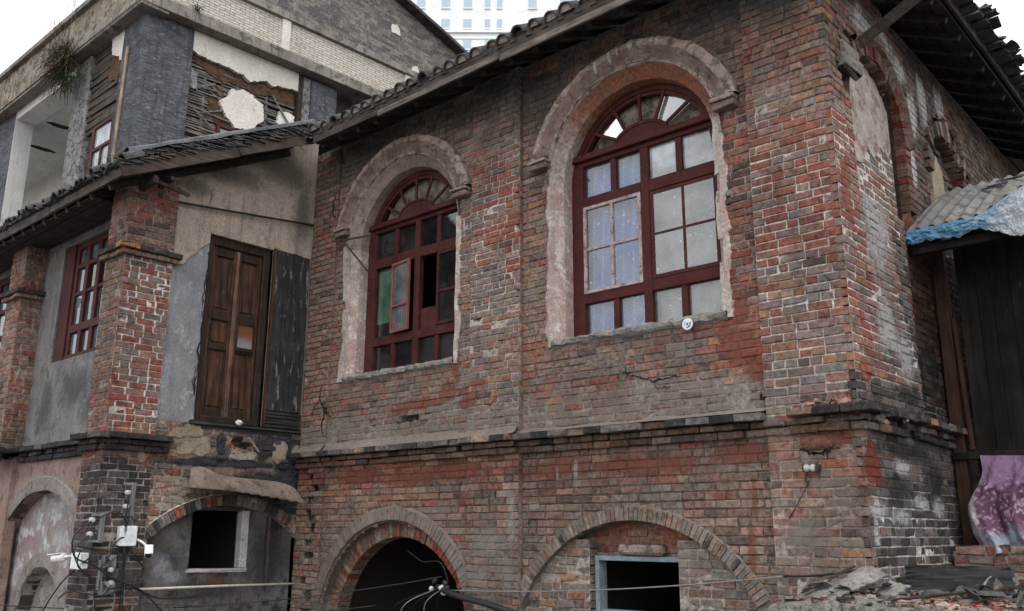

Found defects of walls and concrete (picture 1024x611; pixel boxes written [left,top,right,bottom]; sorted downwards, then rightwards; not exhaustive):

flaking render [189,31,299,130]
crack [618,371,683,389]
crack [313,384,331,437]
flaking render [168,424,210,457]
flaking render [229,445,257,461]
flaking render [271,441,300,464]
leakage [867,460,944,545]